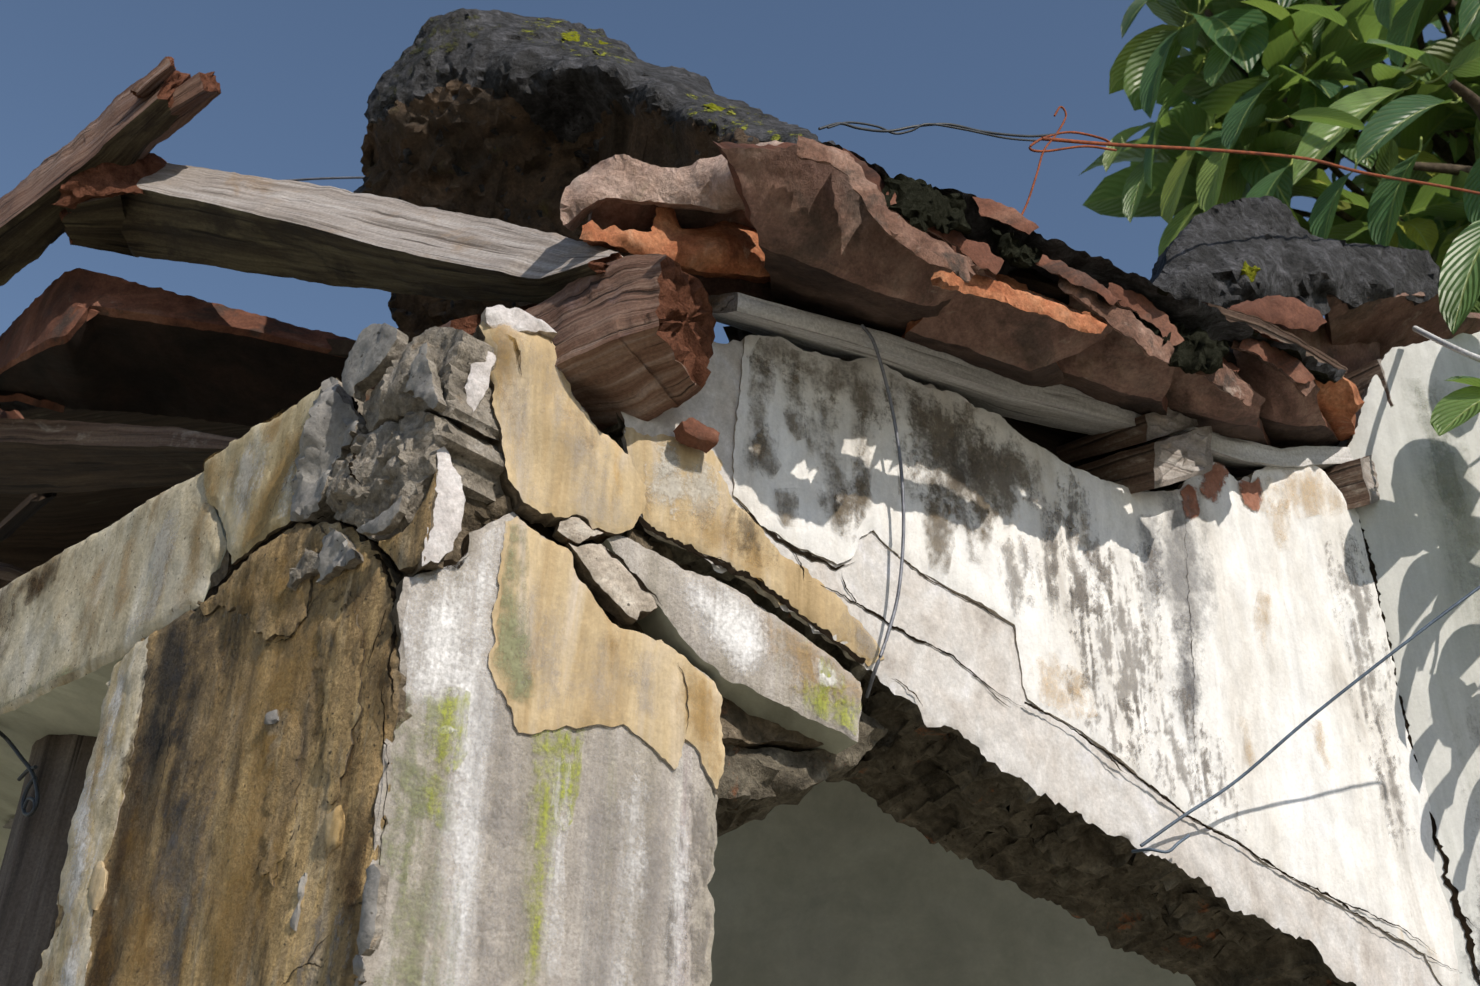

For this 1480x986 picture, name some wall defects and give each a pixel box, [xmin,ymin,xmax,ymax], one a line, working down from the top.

damp [65,618,211,986]
crack [194,464,468,865]
crack [342,397,366,486]
peeling [341,323,446,413]
damp [405,565,494,978]
flaking render [463,351,496,411]
crack [518,515,660,603]
flaking render [487,516,725,795]
efflorescence [690,584,766,670]
damp [748,338,1238,816]
crack [638,497,1480,985]
damp [1326,540,1409,846]